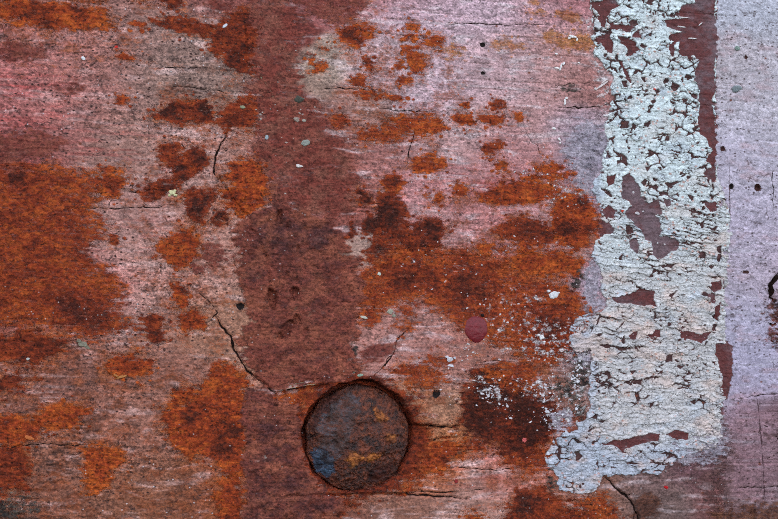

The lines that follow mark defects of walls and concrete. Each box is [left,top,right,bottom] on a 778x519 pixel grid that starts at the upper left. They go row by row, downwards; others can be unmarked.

rust [0,0,262,81]
rust [51,79,85,101]
rust [108,87,137,108]
rust [143,91,260,137]
crack [212,127,230,188]
rust [272,0,625,519]
peeling [544,0,734,494]
rust [0,124,273,519]
crack [195,290,275,393]
crack [603,476,639,519]